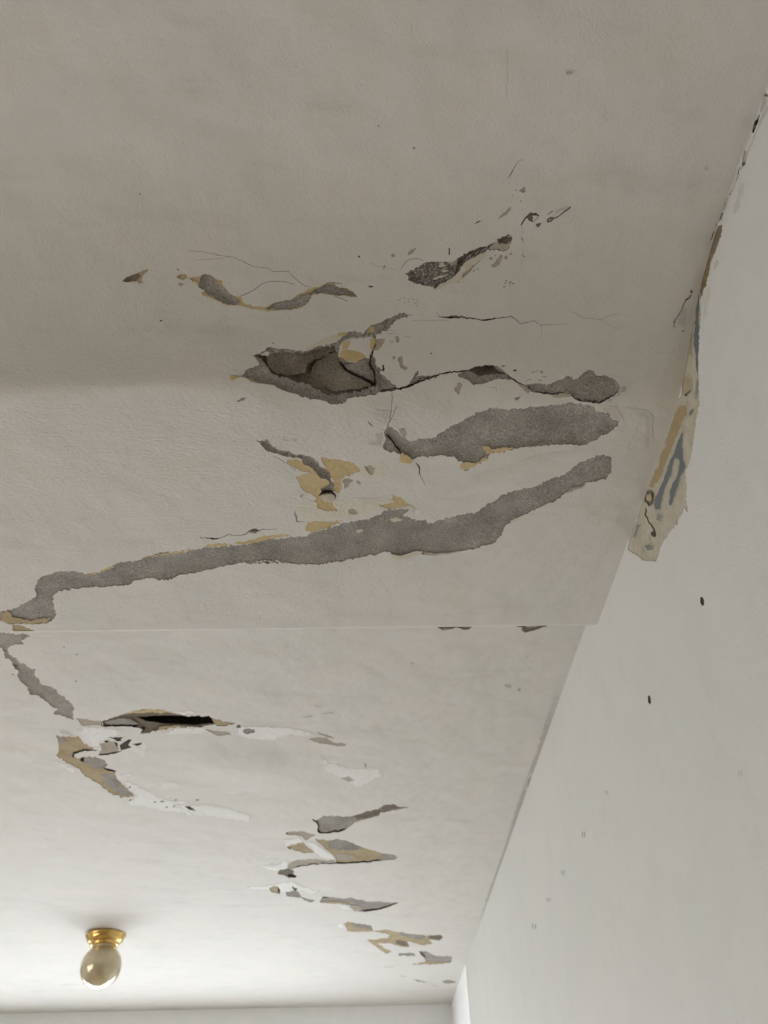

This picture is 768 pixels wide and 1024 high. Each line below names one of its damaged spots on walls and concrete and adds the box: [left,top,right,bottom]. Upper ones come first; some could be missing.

peeling [177,268,358,312]
spalling [405,234,512,290]
spalling [230,297,418,404]
spalling [0,365,629,801]
spalling [246,804,455,987]